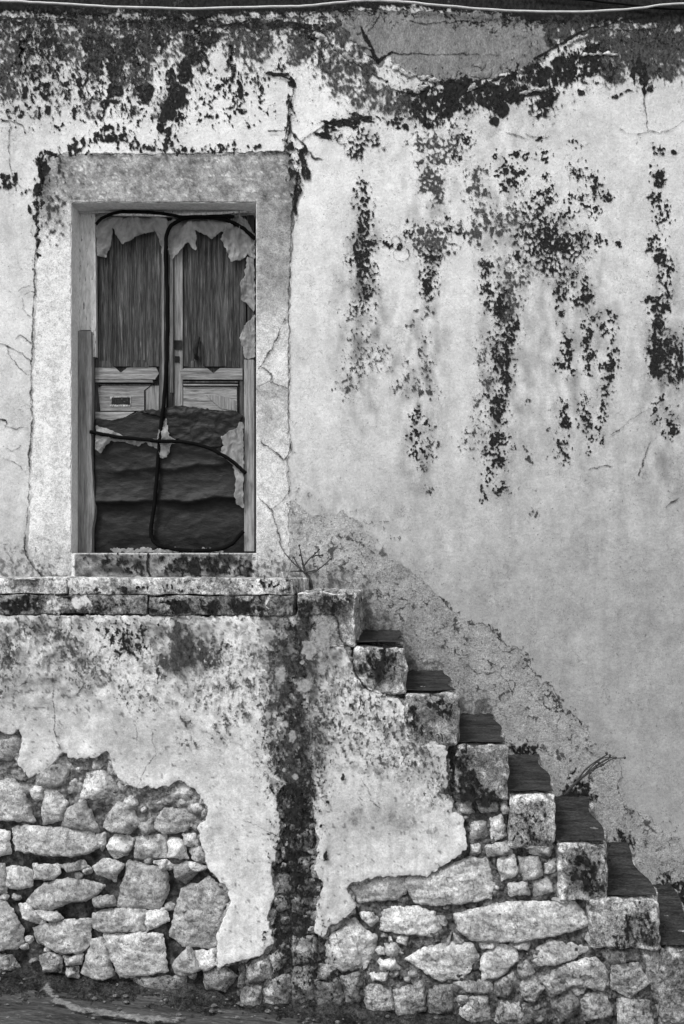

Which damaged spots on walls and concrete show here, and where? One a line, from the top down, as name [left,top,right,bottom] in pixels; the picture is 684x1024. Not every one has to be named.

water stain [0,4,244,136]
crack [0,15,661,95]
water stain [561,25,684,99]
crack [0,72,340,577]
peeling [322,86,622,504]
water stain [0,548,502,1008]
flaking render [0,731,684,1024]
flaking render [284,488,684,906]